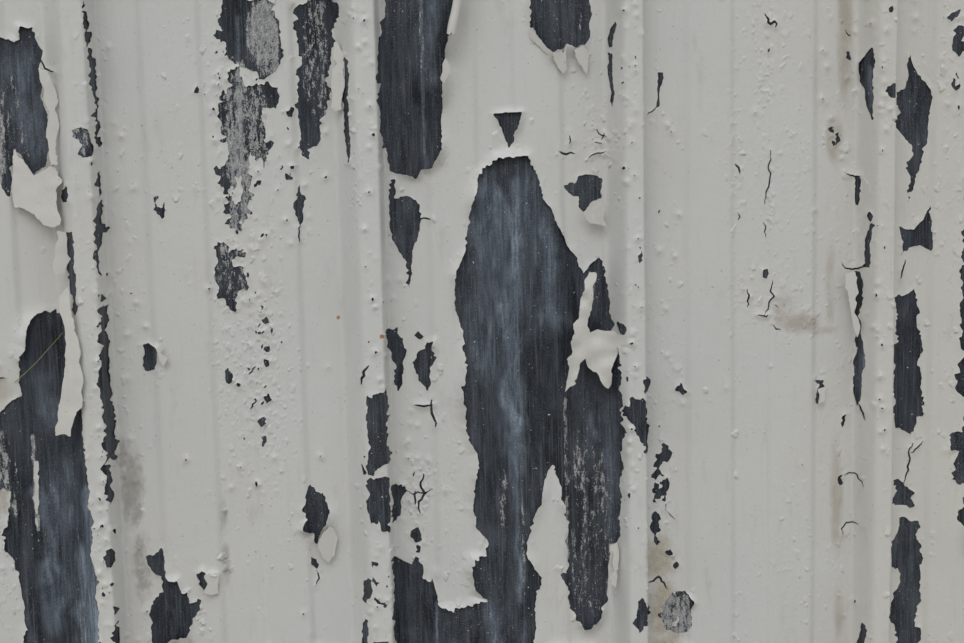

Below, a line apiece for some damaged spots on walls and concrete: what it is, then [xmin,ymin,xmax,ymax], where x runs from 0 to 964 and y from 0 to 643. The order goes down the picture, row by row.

peeling [194,0,464,317]
peeling [522,0,598,74]
peeling [0,0,126,643]
peeling [140,542,224,643]
peeling [220,305,282,452]
peeling [296,478,338,591]
peeling [355,106,678,643]
peeling [876,2,964,643]